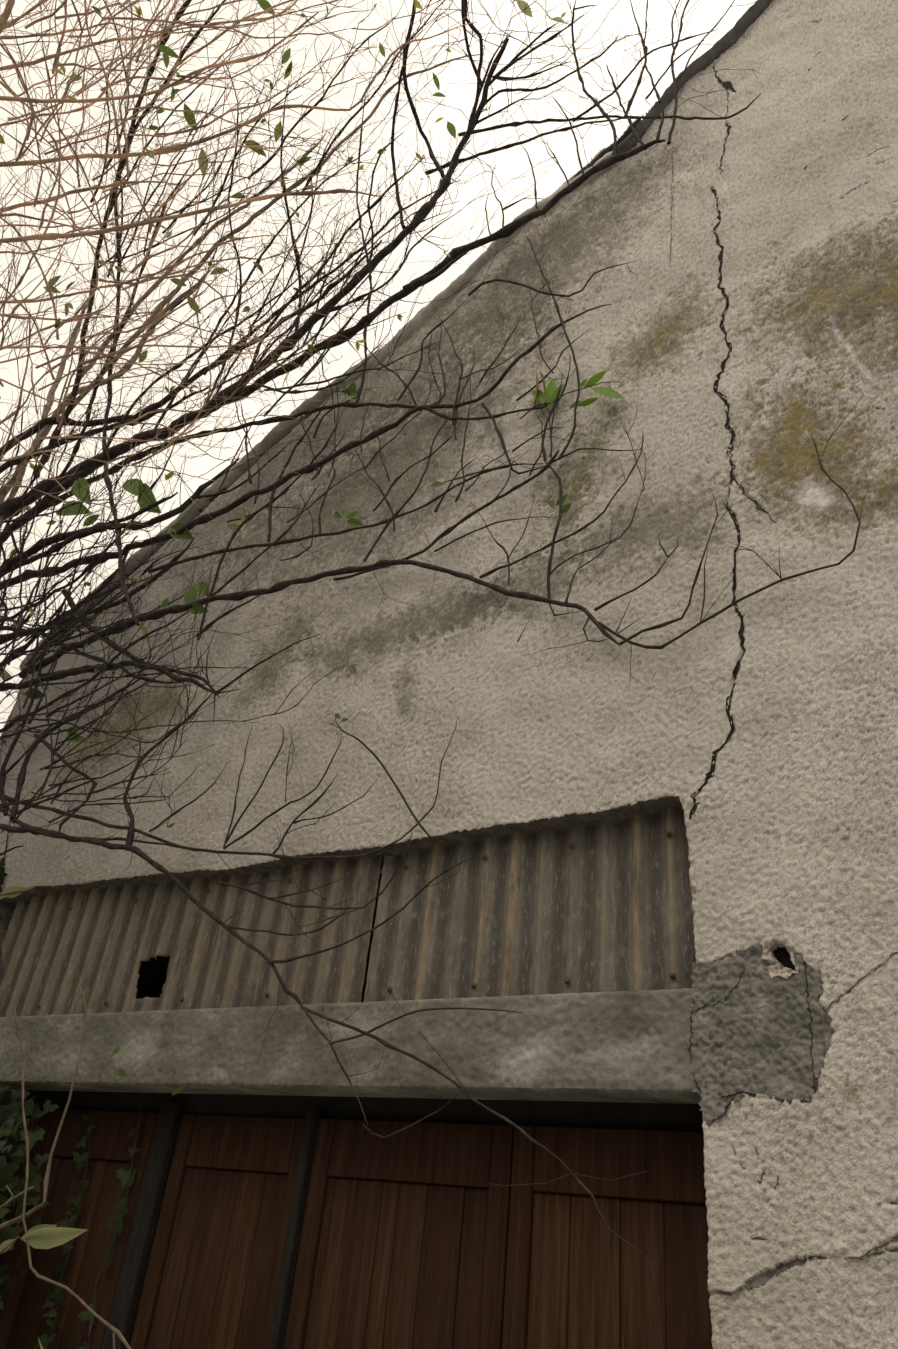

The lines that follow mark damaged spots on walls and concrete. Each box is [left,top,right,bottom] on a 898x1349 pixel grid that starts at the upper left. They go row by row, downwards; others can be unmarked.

crack [668,147,676,262]
water stain [246,151,676,567]
water stain [832,322,872,379]
crack [689,66,775,820]
water stain [795,476,836,512]
spalling [689,934,834,1125]
crack [823,952,898,1012]
crack [716,1236,898,1295]